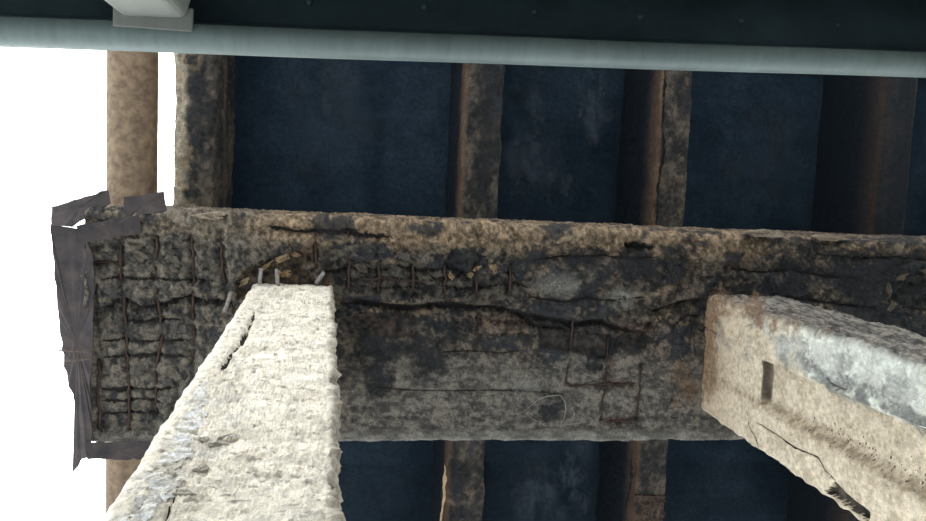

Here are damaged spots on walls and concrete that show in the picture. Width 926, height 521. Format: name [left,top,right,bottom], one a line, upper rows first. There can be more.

leakage [182,55,206,199]
peeling [190,211,228,220]
leakage [535,242,589,297]
spalling [624,241,655,251]
peeling [740,229,786,238]
leakage [610,289,639,309]
spalling [84,231,524,521]
leakage [342,312,475,398]
leakage [538,399,563,421]
spalling [477,313,648,362]
spalling [565,363,643,422]
crack [746,411,836,481]